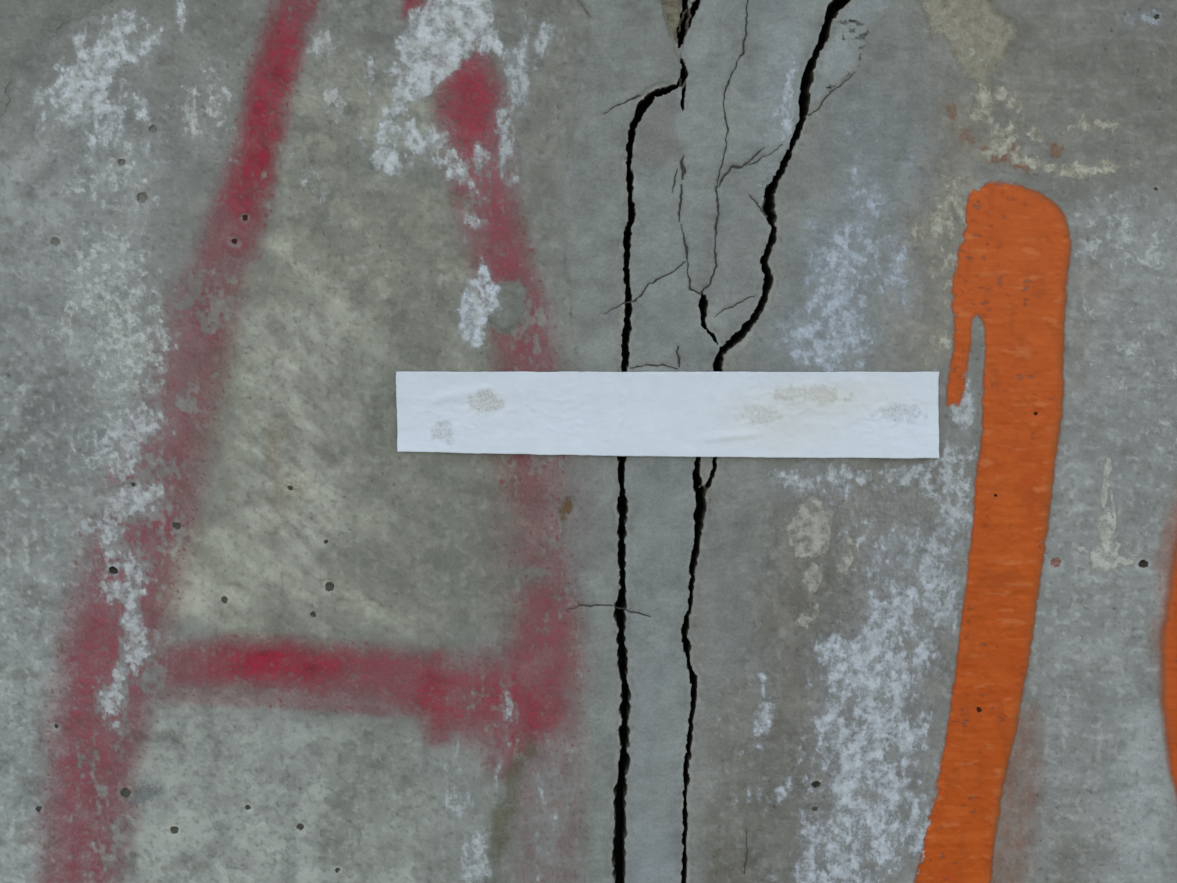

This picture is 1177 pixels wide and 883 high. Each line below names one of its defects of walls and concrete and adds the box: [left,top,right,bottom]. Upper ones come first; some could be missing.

spalling [920,0,1133,179]
peeling [1122,8,1160,25]
crack [603,0,855,372]
peeling [912,174,968,311]
efflorescence [949,373,976,432]
crack [565,456,651,883]
crack [681,457,717,883]
efflorescence [739,673,772,755]
efflorescence [774,440,978,883]